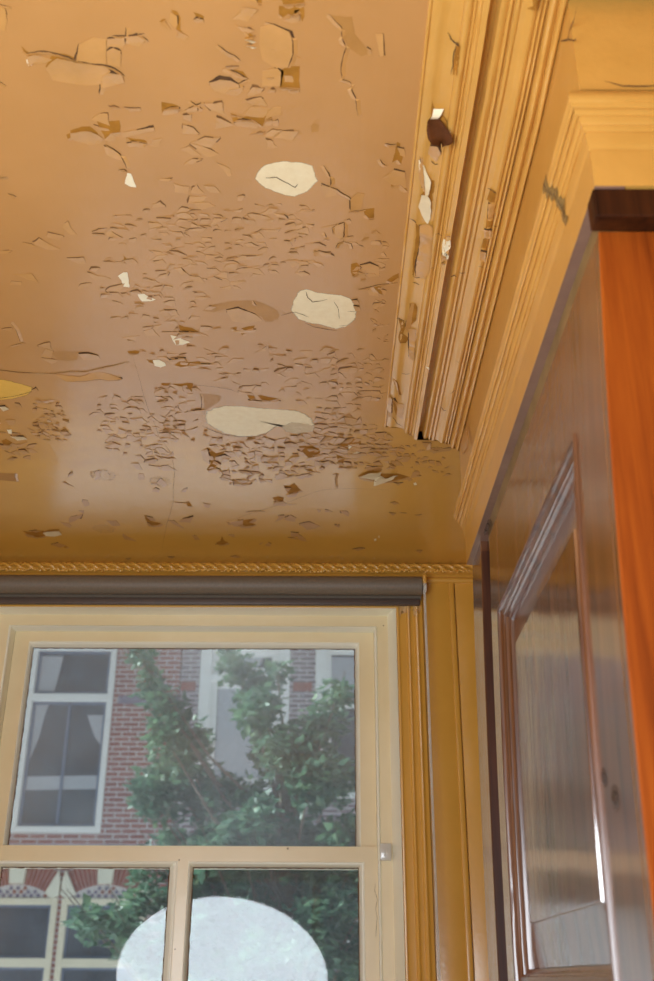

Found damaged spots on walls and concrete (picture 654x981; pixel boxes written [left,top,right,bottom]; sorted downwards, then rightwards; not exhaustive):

peeling [21,37,125,95]
peeling [159,0,304,176]
peeling [326,14,385,115]
peeling [448,33,460,76]
peeling [66,105,162,187]
peeling [409,103,453,285]
peeling [23,165,452,549]
peeling [0,387,71,461]